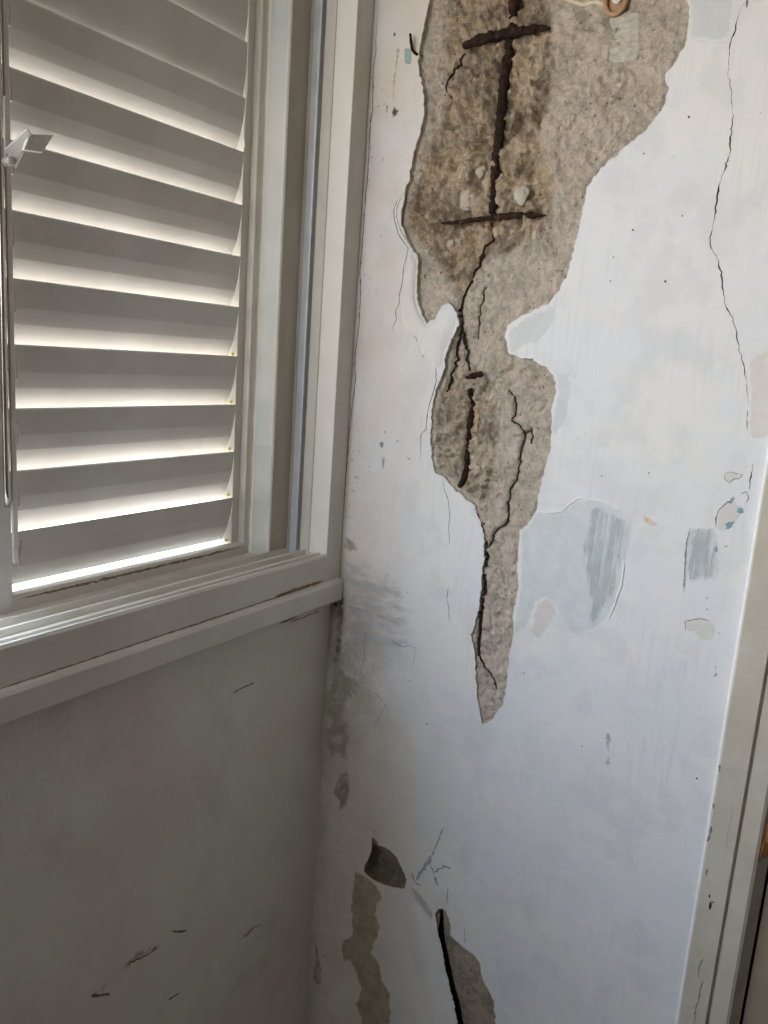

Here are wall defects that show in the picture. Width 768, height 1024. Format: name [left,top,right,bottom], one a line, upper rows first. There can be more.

spalling [401,0,689,726]
crack [709,0,749,432]
crack [443,391,534,690]
peeling [341,836,407,1024]
crack [438,890,465,1024]
spalling [435,908,496,1024]